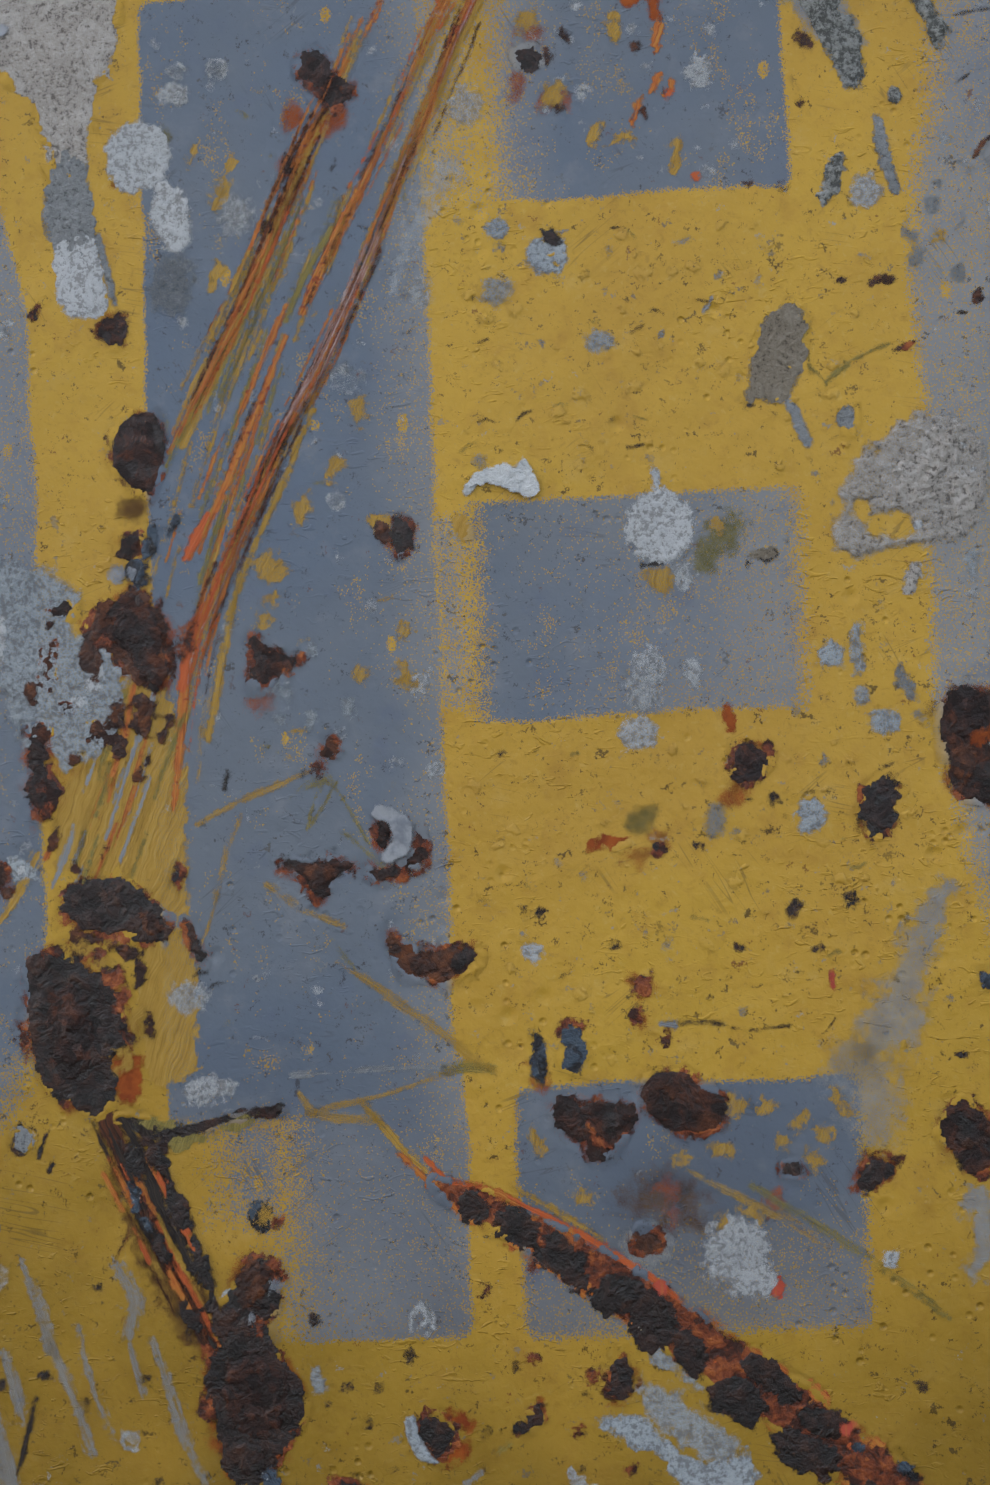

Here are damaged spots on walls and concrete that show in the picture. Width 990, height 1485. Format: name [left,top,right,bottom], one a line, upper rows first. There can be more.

peeling [0,0,127,321]
peeling [834,402,863,442]
peeling [0,557,176,811]
corrosion [17,406,199,852]
corrosion [915,673,990,813]
peeling [7,852,41,884]
corrosion [273,804,435,908]
corrosion [12,845,314,1485]
corrosion [543,968,731,1171]
corrosion [930,1090,990,1186]
corrosion [423,1168,933,1485]
peeling [595,1372,763,1485]